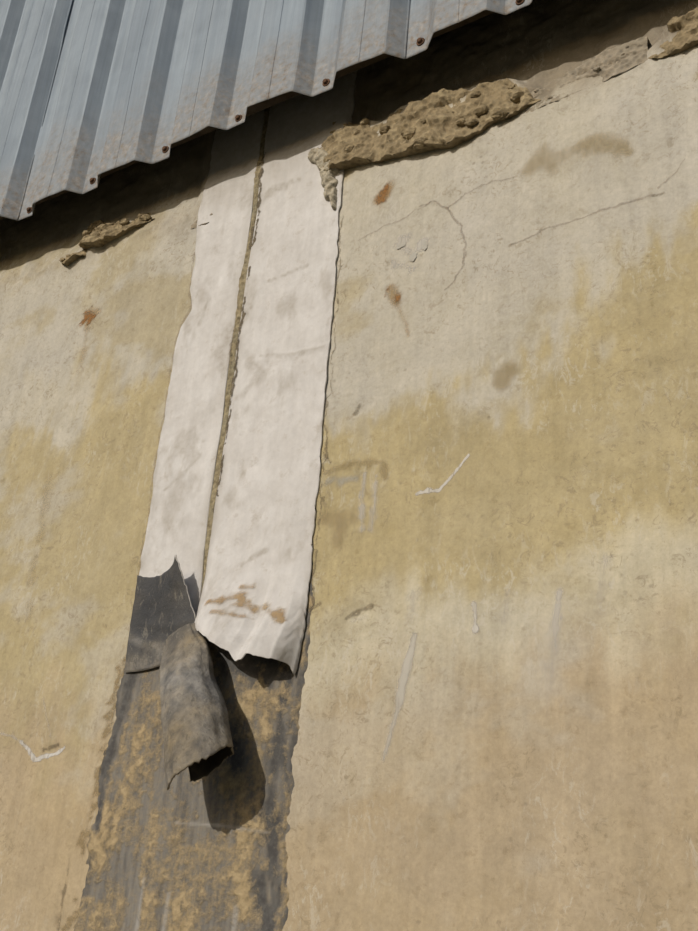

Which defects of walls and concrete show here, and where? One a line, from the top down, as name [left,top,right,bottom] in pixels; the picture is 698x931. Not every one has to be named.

spalling [557,7,698,88]
corrosion [376,184,392,204]
peeling [59,70,585,931]
corrosion [205,585,285,623]